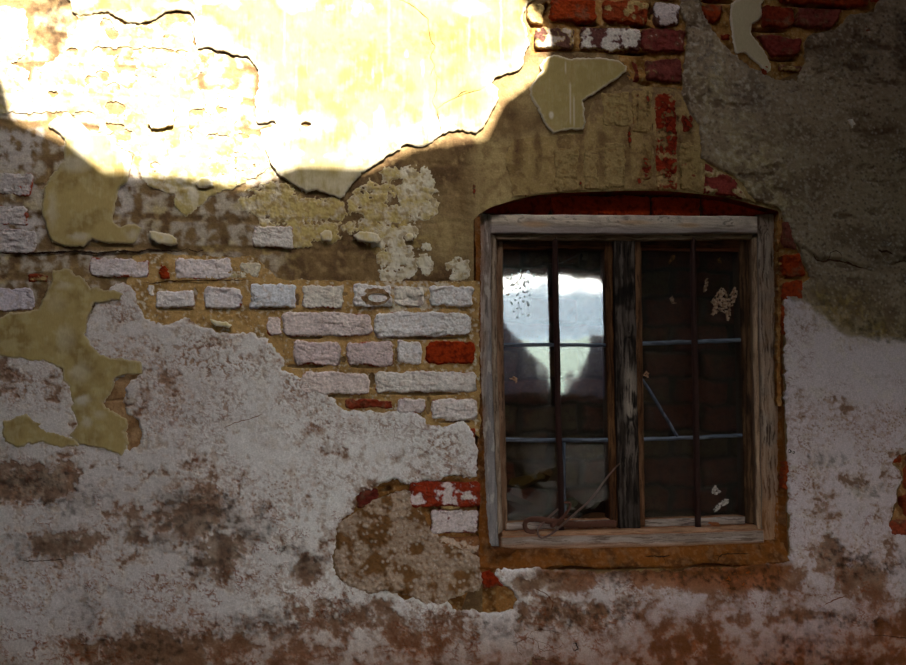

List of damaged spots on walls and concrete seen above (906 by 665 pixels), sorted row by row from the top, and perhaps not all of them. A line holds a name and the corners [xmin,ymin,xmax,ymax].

crack [403,0,479,129]
spalling [701,0,879,80]
peeling [0,0,756,456]
crack [813,250,863,268]
leakage [152,490,271,541]
spalling [342,474,481,554]
spalling [889,454,906,535]
leakage [283,546,323,574]
leakage [820,539,888,577]
spalling [448,593,467,610]
spalling [480,569,517,612]